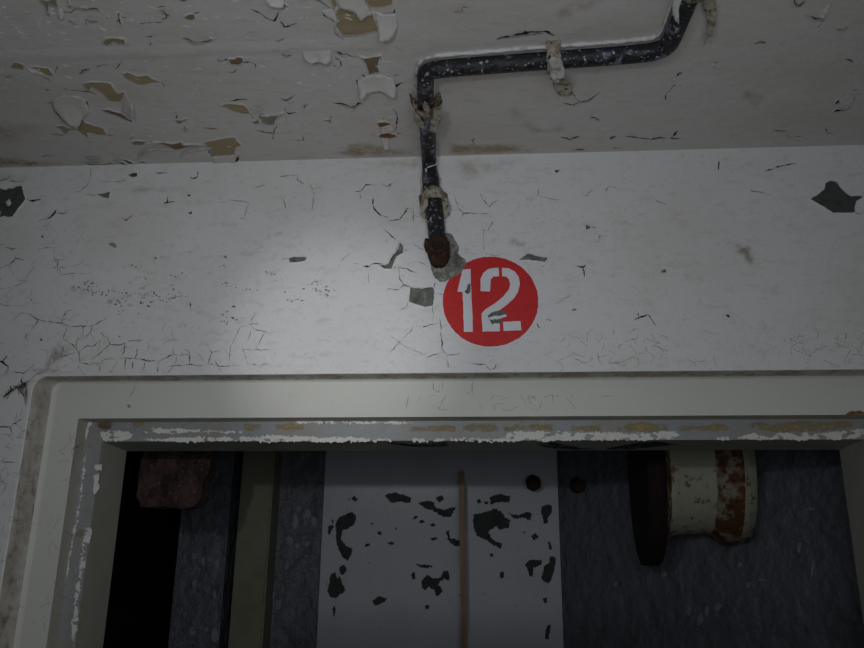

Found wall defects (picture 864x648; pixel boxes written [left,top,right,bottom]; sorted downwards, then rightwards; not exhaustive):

peeling [317,0,398,43]
spalling [0,175,41,219]
spalling [809,179,864,215]
spalling [364,229,436,315]
crack [0,169,268,550]
peeling [144,427,392,443]
peeling [412,430,680,443]
peeling [717,428,864,441]
peeling [385,492,460,546]
peeling [473,494,552,557]
peeling [327,512,356,618]
peeling [411,564,450,596]